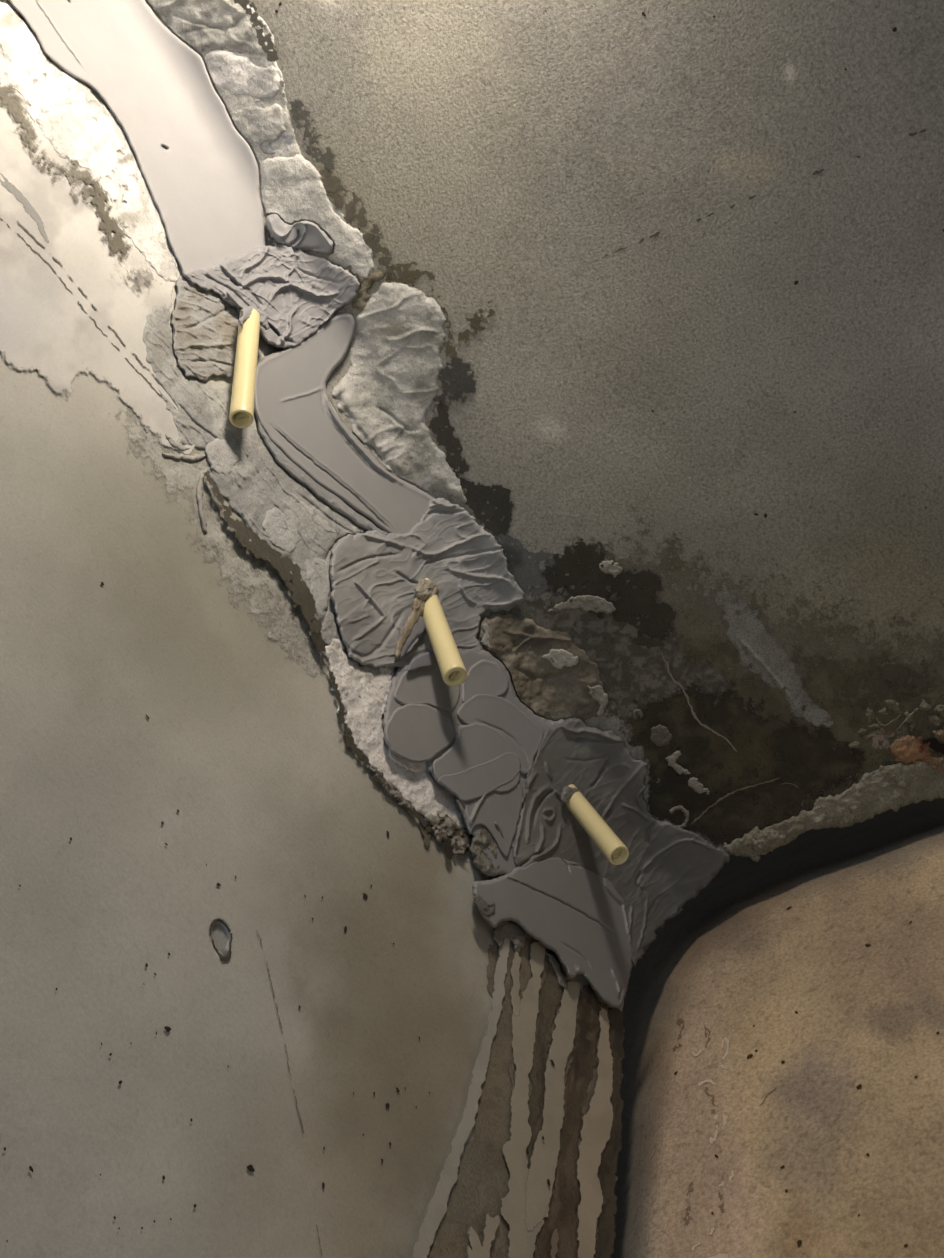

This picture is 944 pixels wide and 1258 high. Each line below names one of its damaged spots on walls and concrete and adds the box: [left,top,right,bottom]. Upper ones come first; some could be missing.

water stain [0,0,196,455]
peeling [148,0,467,504]
peeling [262,501,336,553]
peeling [305,557,341,645]
peeling [548,595,616,615]
peeling [481,623,490,650]
peeling [542,649,579,669]
peeling [587,685,609,717]
water stain [479,508,944,845]
rust [865,726,944,771]
water stain [413,937,625,1258]